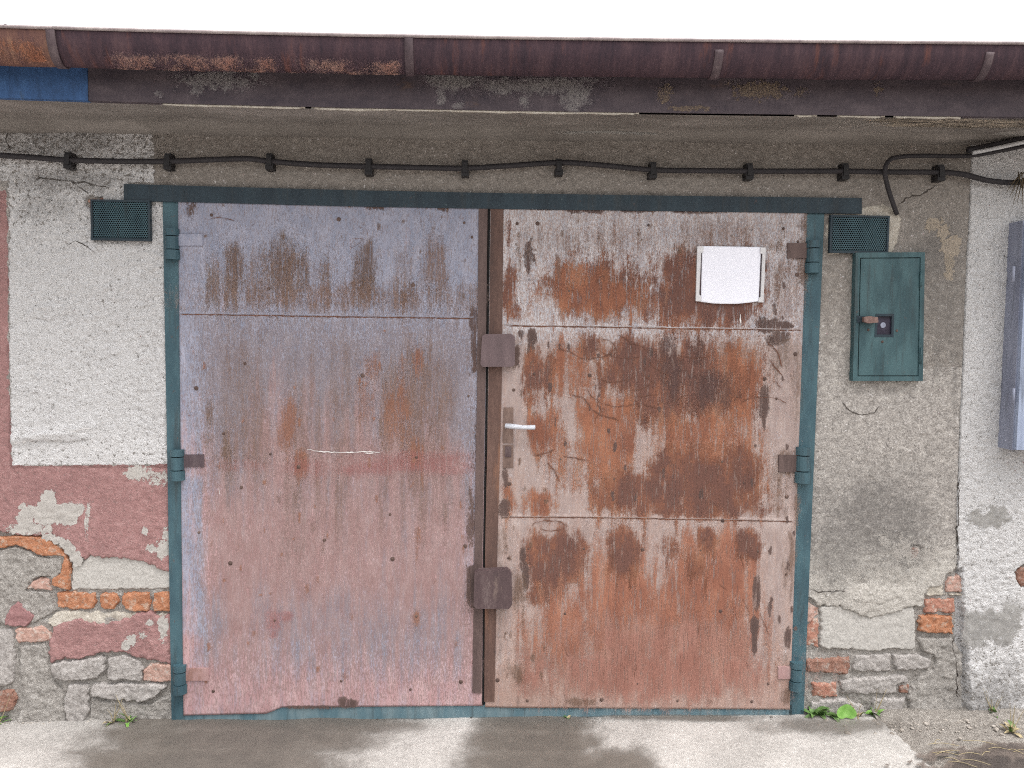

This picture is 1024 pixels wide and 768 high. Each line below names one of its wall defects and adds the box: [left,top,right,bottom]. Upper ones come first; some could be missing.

corrosion [207,233,478,373]
peeling [122,465,168,487]
corrosion [277,380,350,530]
corrosion [330,339,454,549]
corrosion [460,422,476,549]
corrosion [498,211,807,711]
crack [952,478,960,566]
flaking render [0,489,172,723]
corrosion [287,697,359,709]
flaking render [804,533,1024,714]
crack [949,635,959,697]